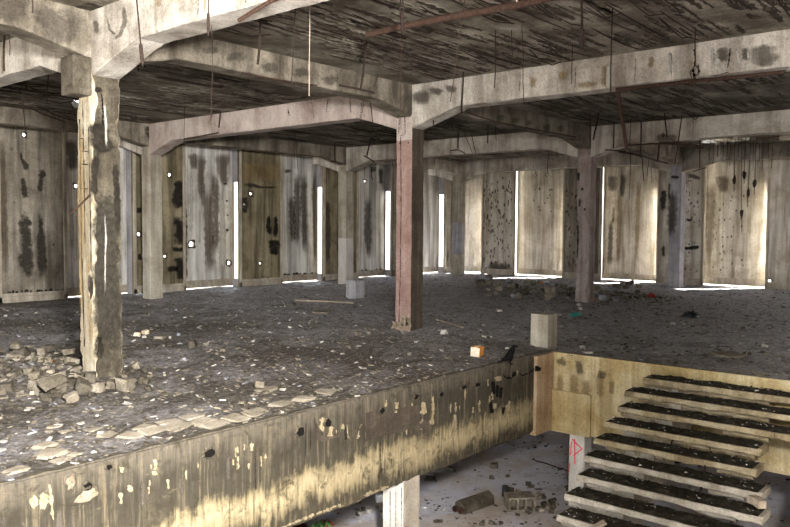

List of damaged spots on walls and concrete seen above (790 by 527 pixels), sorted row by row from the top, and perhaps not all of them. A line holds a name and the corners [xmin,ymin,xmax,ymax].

peeling [226,11,301,37]
peeling [308,9,526,79]
peeling [510,34,591,66]
peeling [149,73,308,110]
damp [20,153,29,197]
damp [0,151,8,265]
damp [289,180,317,257]
damp [18,212,48,276]
peeling [411,391,444,430]
spalling [450,370,518,422]
peeling [29,484,54,520]
spalling [63,470,103,506]